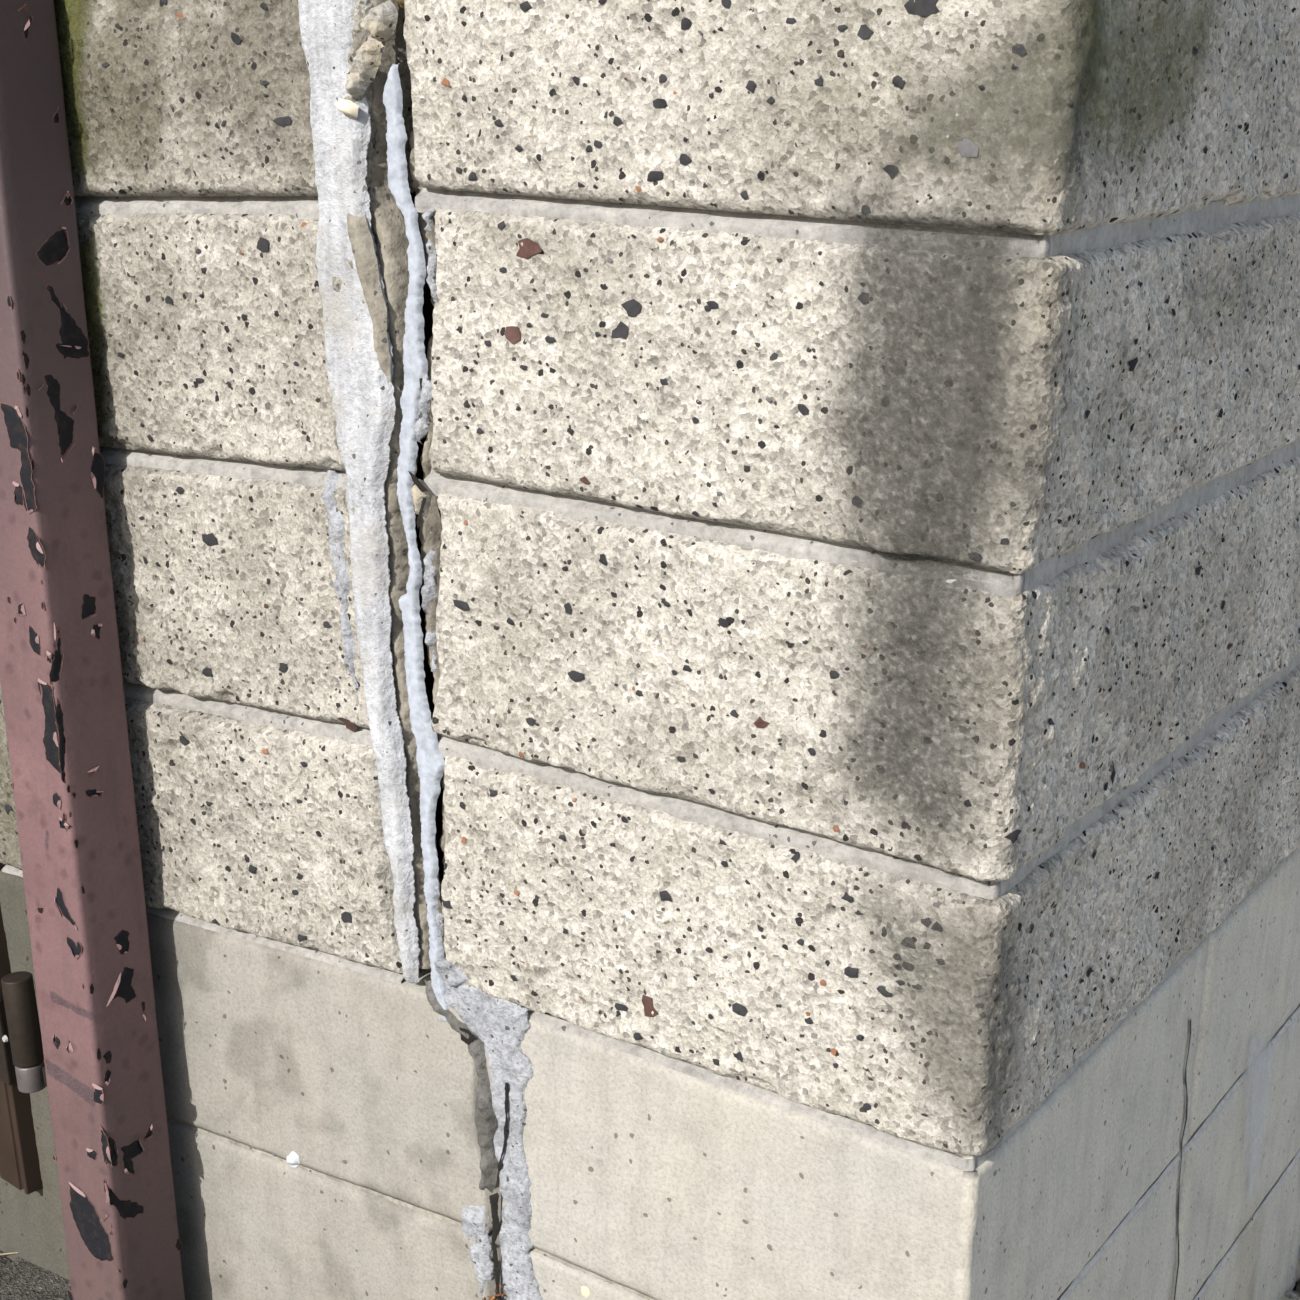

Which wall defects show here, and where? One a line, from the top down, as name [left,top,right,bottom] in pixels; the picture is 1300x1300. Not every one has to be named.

crack [368,0,446,970]
water stain [837,206,1010,838]
crack [459,1027,475,1045]
crack [489,1083,508,1300]
water stain [888,919,1012,1120]
crack [1174,1020,1191,1300]